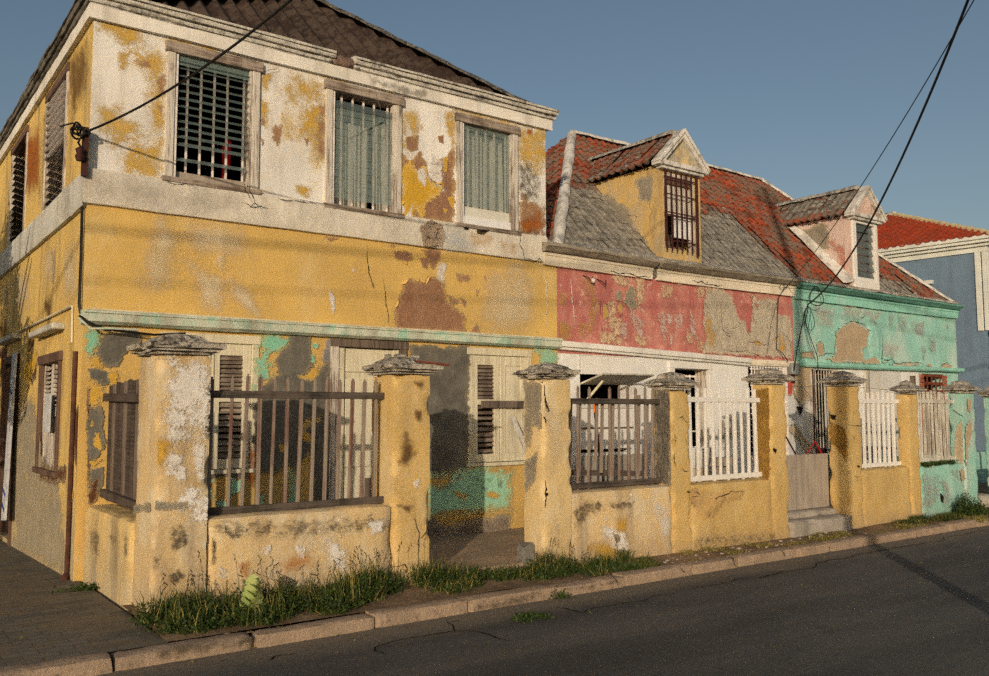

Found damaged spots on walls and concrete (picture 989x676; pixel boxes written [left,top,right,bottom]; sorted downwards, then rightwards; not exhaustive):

peeling [98,22,167,177]
peeling [260,73,345,166]
spalling [328,54,360,70]
flaking render [390,110,546,333]
flaking render [11,328,119,574]
leakage [159,355,271,559]
peeling [366,519,384,536]
peeling [413,380,550,538]
peeling [597,517,630,559]
peeling [599,268,682,345]
flaking render [754,388,777,480]
flaking render [685,286,952,460]